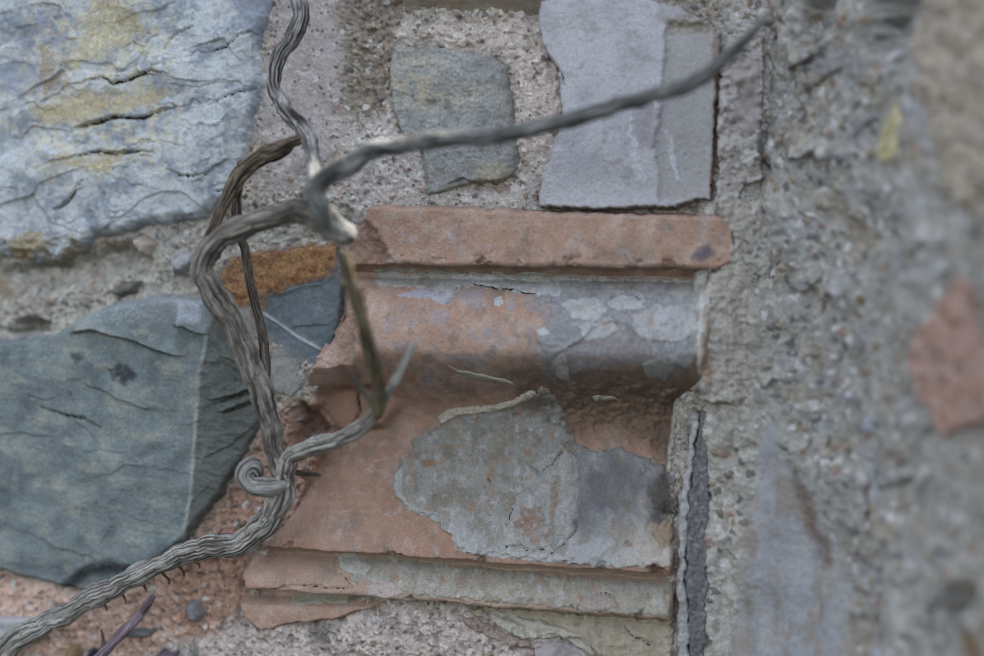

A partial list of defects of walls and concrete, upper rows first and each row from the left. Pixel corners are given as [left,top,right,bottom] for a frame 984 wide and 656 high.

spalling [307,297,363,395]
peeling [349,215,714,390]
peeling [334,365,679,656]